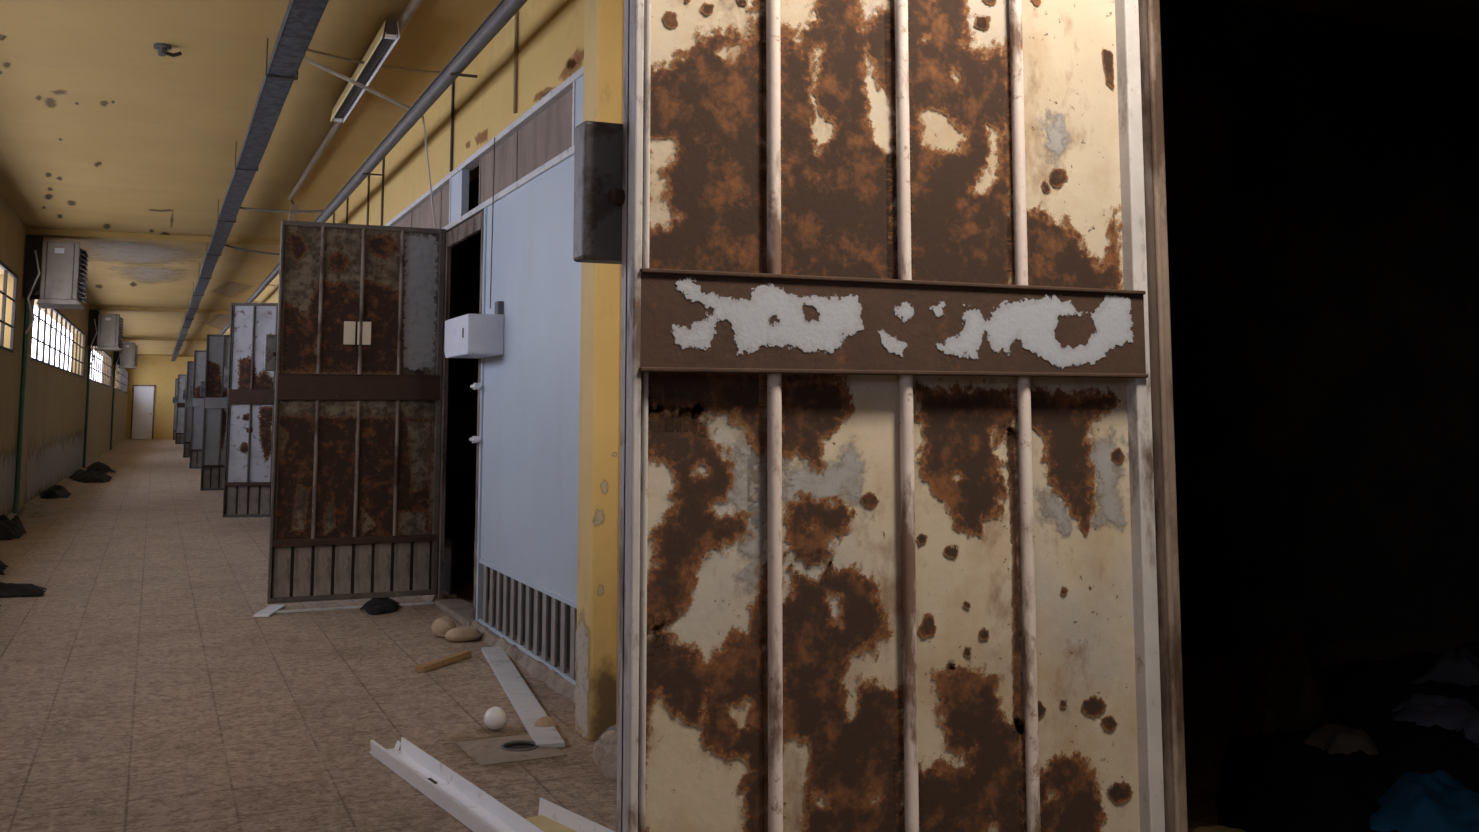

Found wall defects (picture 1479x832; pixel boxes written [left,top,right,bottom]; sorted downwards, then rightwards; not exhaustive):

corrosion [365,233,400,260]
corrosion [642,0,1124,290]
corrosion [194,249,433,540]
peeling [574,610,589,739]
corrosion [638,372,1133,832]